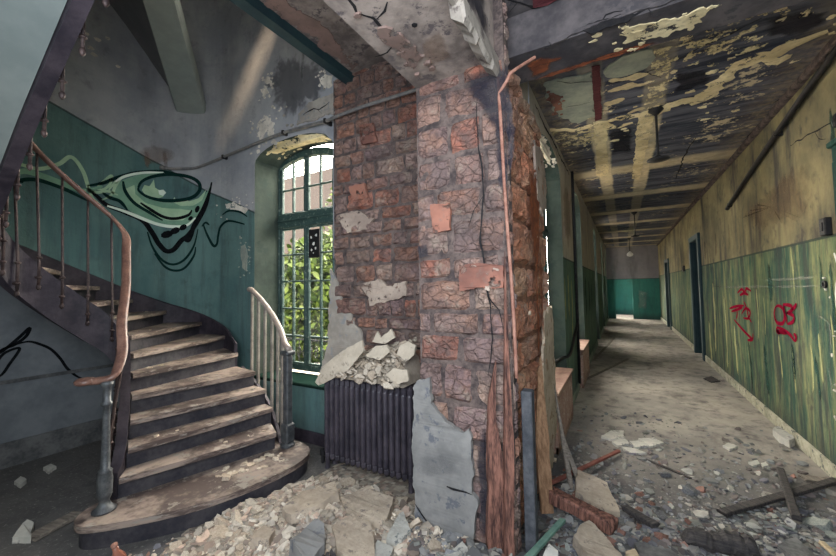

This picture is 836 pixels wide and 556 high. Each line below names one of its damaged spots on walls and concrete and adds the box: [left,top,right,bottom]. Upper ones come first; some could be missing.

crack [348,0,392,57]
flaking render [249,0,836,555]